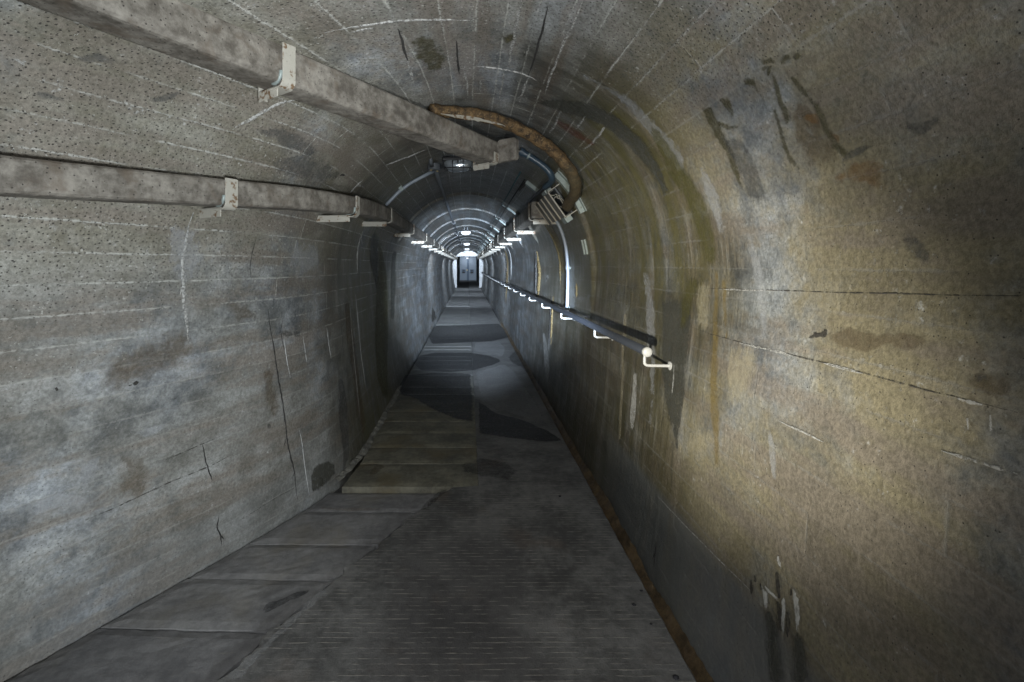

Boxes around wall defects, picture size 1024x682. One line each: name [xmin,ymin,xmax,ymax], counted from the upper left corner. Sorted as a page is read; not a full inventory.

leakage [412,37,446,70]
leakage [704,98,740,184]
leakage [763,53,801,162]
leakage [792,77,847,155]
crack [268,312,298,499]